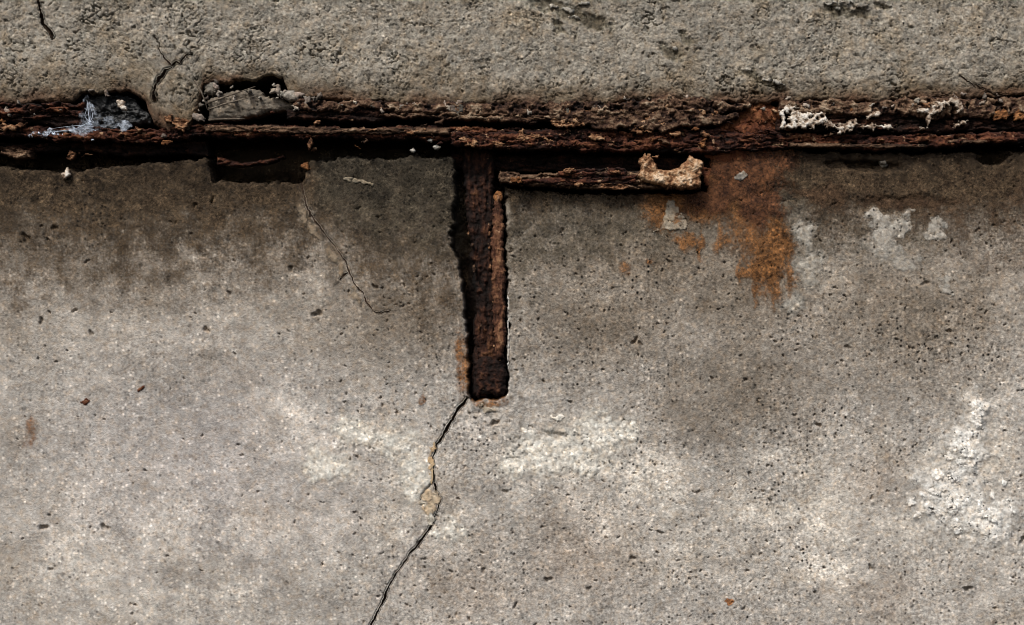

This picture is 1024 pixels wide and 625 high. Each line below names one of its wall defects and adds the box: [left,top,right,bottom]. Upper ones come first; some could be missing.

water stain [779,104,893,135]
water stain [916,96,969,130]
crack [298,182,390,315]
corrosion [0,94,1024,407]
crack [369,397,468,625]